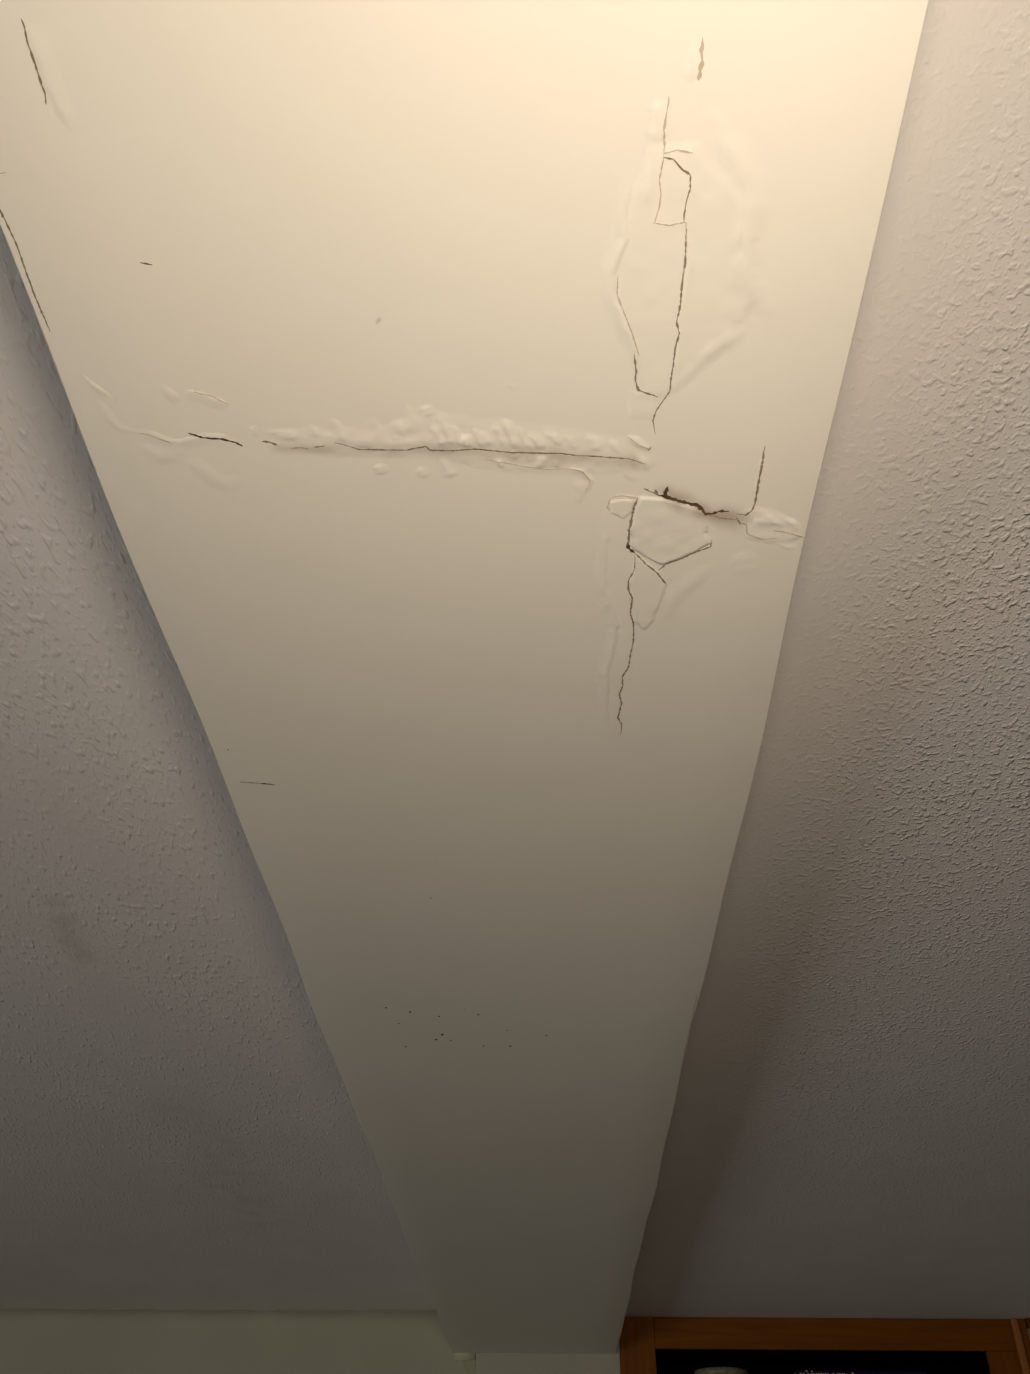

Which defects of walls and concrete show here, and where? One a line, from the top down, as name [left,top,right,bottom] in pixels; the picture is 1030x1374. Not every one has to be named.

crack [21,19,47,104]
crack [696,38,704,81]
crack [0,209,50,331]
crack [141,98,803,730]